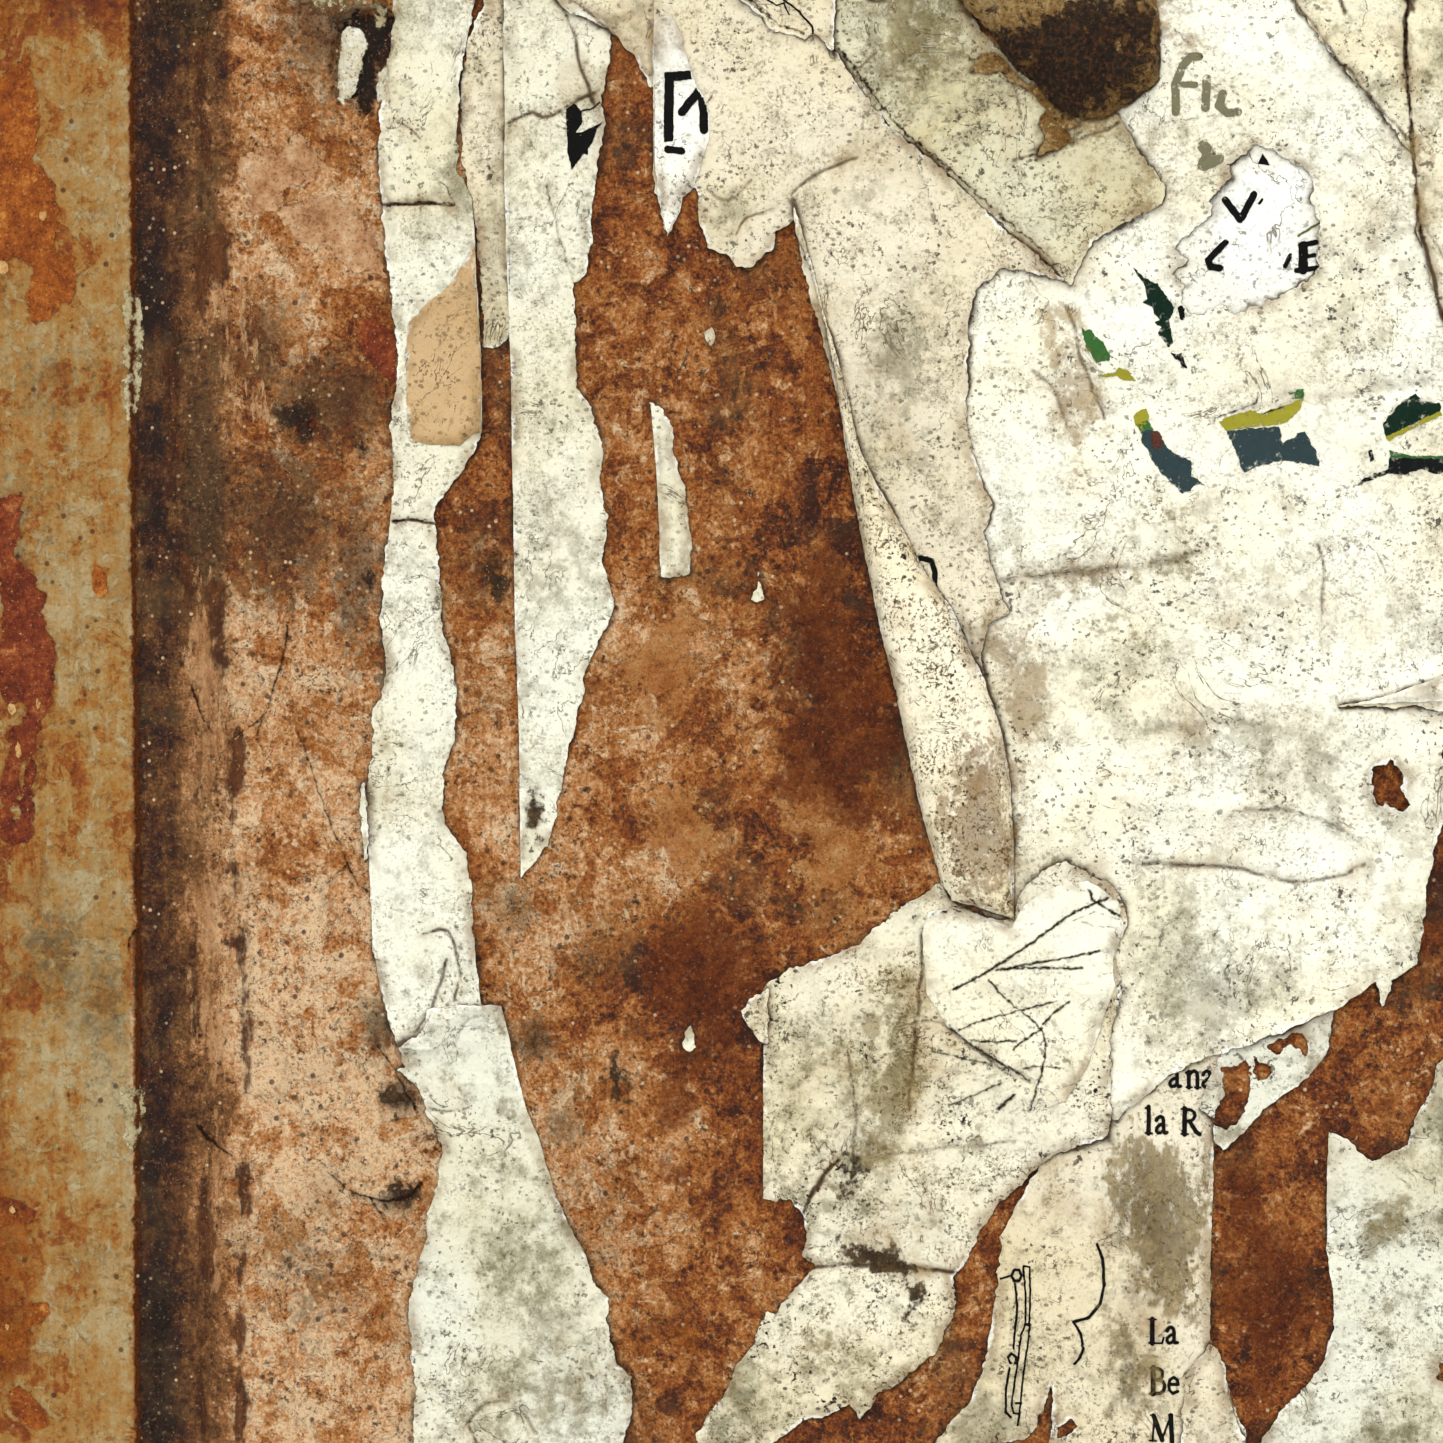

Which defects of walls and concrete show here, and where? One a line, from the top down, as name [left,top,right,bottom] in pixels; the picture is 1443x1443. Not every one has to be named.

spalling [327,2,395,118]
damp [120,289,144,421]
damp [179,527,230,671]
rust [765,539,905,834]
damp [225,725,245,822]
flaking render [635,785,716,878]
flaking render [772,766,885,928]
damp [229,918,253,1093]
rust [647,902,770,1129]
rust [1411,922,1443,987]
damp [235,1150,252,1215]
damp [231,1310,250,1440]